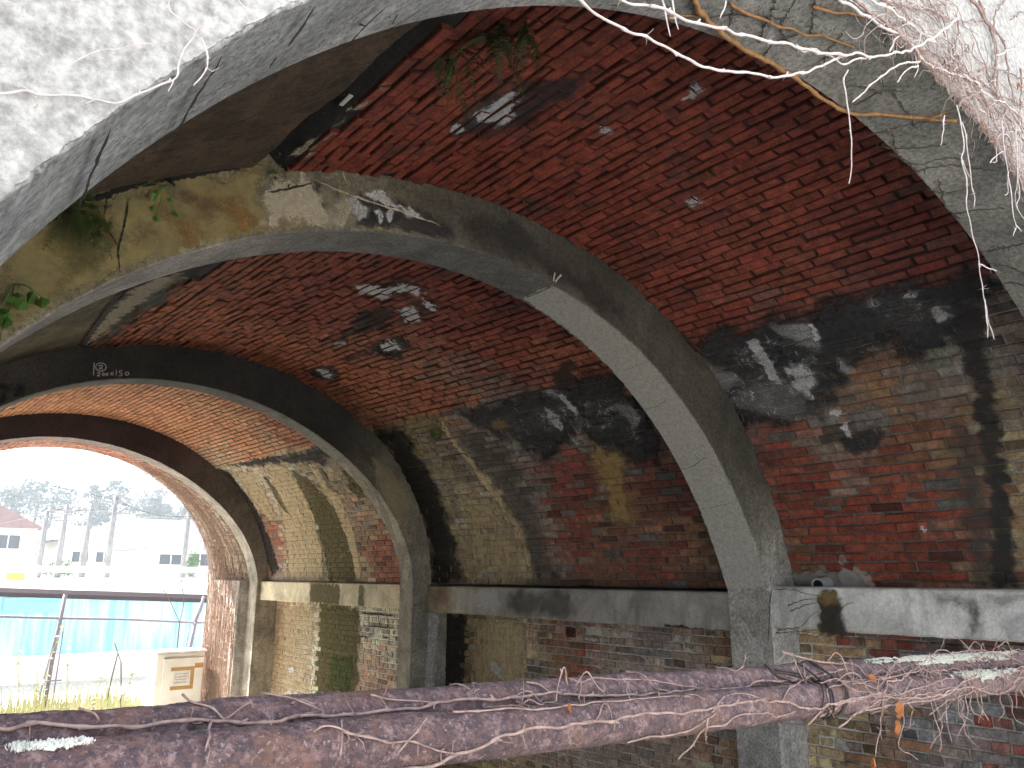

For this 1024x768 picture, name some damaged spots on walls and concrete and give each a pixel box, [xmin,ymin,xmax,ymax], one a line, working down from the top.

crack [78,57,263,271]
peeling [255,172,353,229]
peeling [365,190,419,231]
water stain [746,339,815,395]
water stain [545,395,578,429]
water stain [955,309,1018,589]
water stain [375,421,570,686]